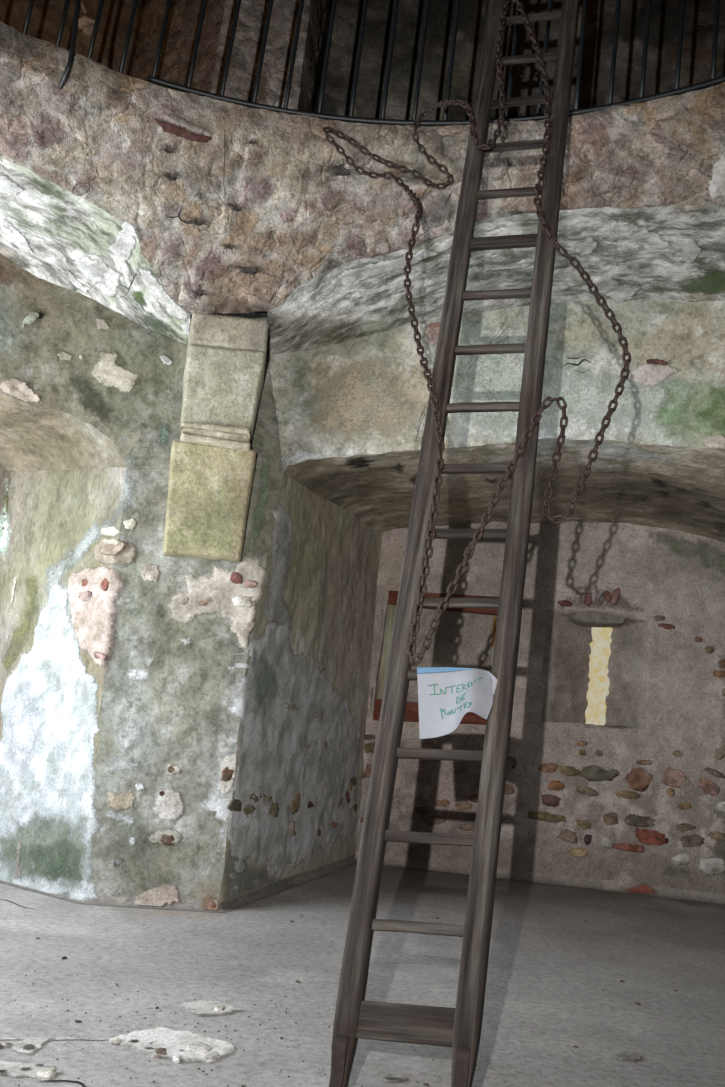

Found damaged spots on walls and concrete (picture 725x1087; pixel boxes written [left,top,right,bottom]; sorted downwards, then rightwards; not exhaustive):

water stain [0,485,11,554]
flaking render [0,518,160,901]
flaking render [168,554,376,890]
flaking render [108,784,184,845]
spalling [388,738,482,832]
crack [39,1079,87,1087]
spalling [0,1027,234,1081]